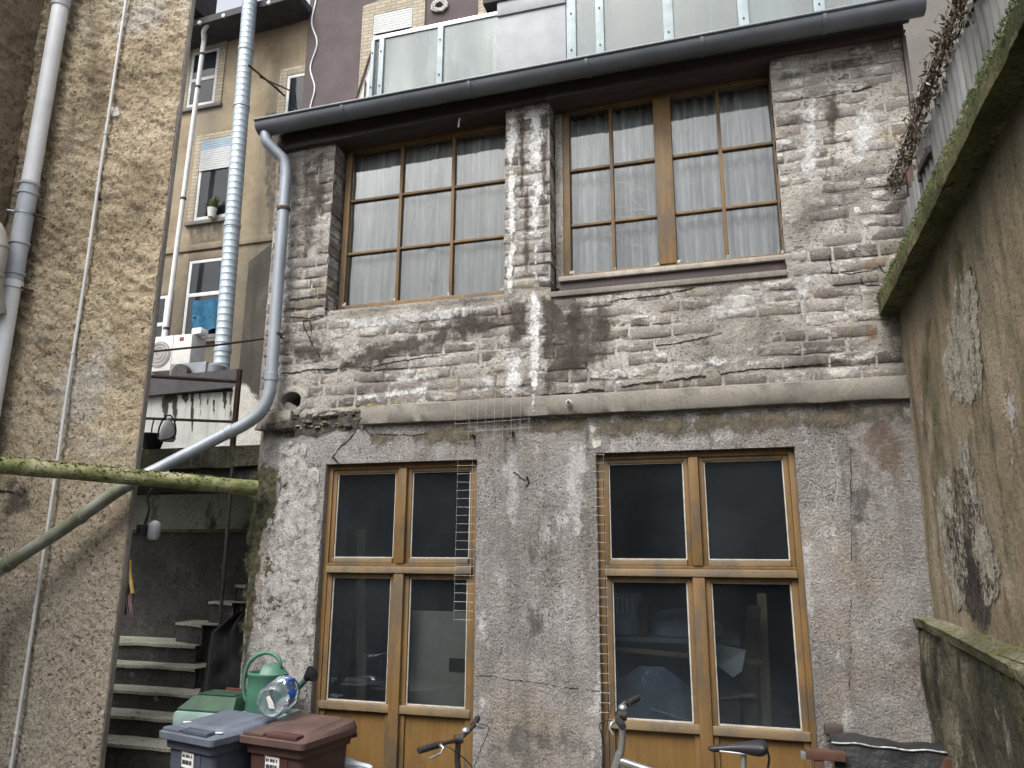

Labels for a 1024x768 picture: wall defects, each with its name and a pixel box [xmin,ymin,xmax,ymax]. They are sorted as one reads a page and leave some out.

leakage [801,93,839,186]
crack [281,294,447,374]
leakage [295,111,911,534]
flaking render [941,267,983,409]
leakage [162,391,232,430]
crack [282,428,431,486]
flaking render [932,436,1001,630]